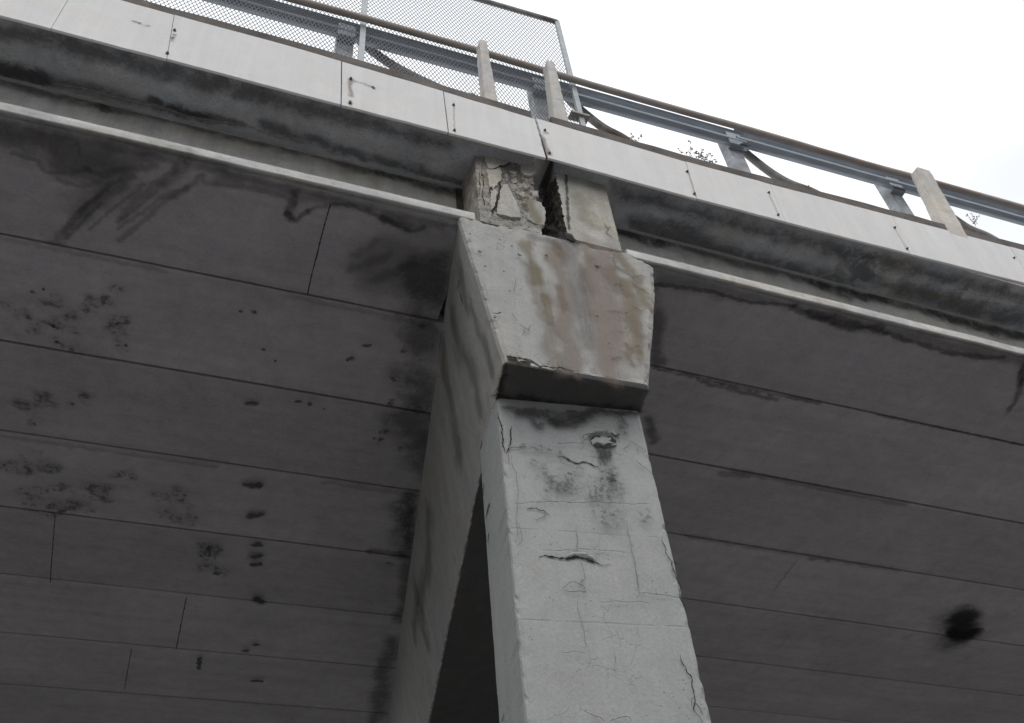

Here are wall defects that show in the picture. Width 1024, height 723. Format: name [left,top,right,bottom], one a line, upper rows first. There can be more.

crack [479,162,517,215]
spalling [484,156,576,243]
spalling [560,430,620,457]
crack [480,412,686,653]
leakage [948,611,980,641]
crack [680,654,703,720]